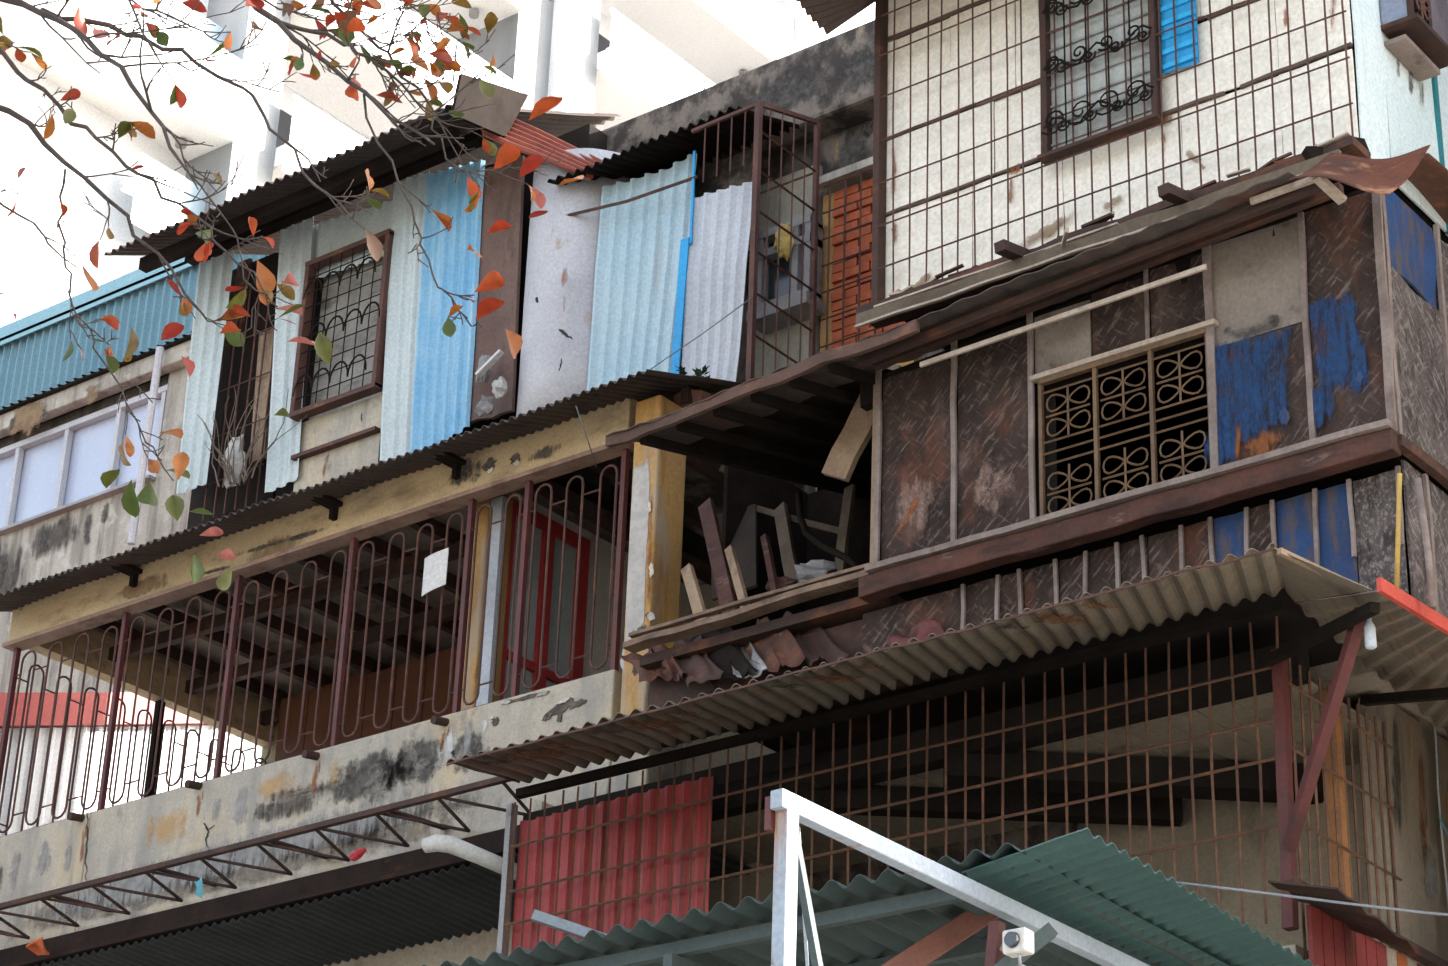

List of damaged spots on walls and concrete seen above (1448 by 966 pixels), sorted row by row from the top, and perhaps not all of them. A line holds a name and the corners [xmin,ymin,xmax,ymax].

damp [753,50,874,112]
damp [840,118,874,167]
corrosion [1289,145,1430,195]
peeling [1204,325,1291,466]
peeling [1310,293,1368,428]
damp [0,504,108,593]
peeling [620,461,655,676]
spalling [490,691,587,726]
damp [34,720,489,928]